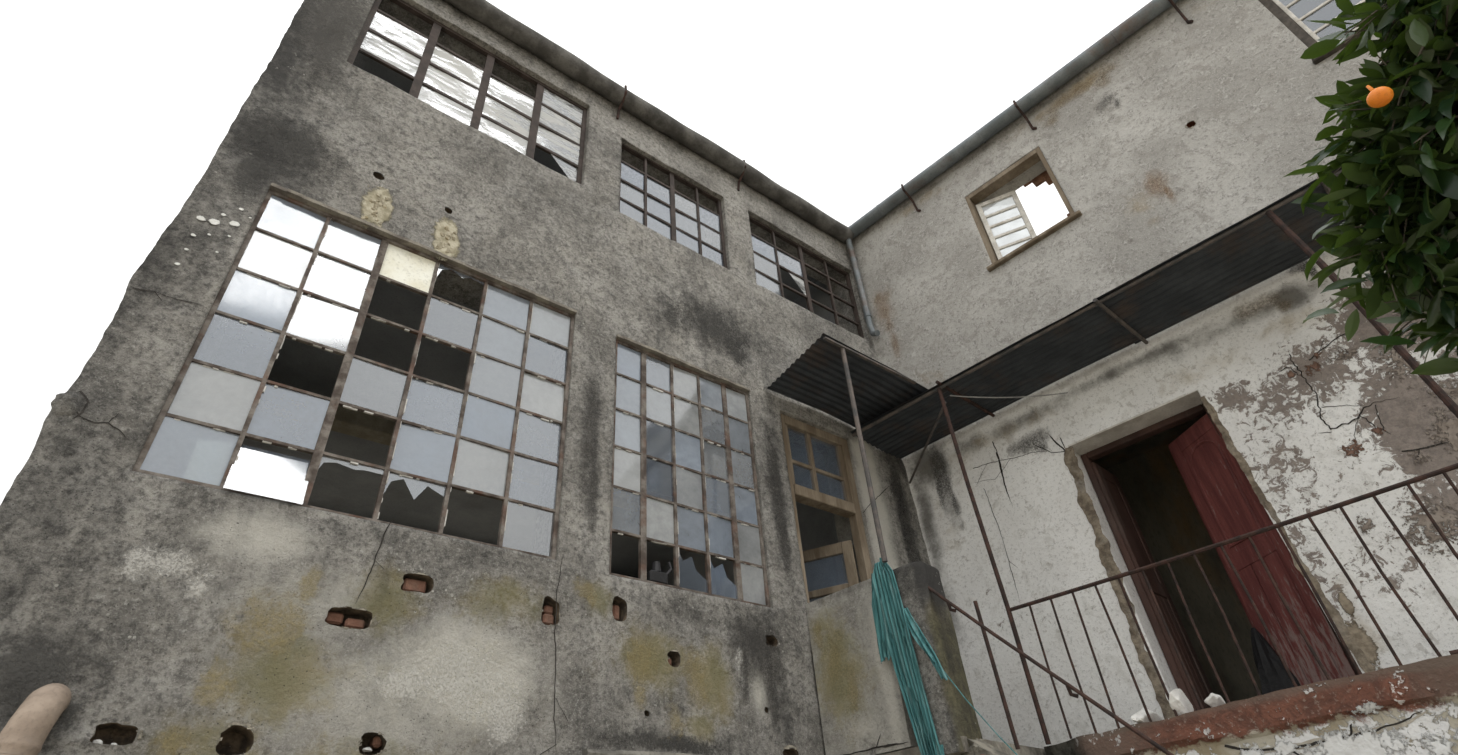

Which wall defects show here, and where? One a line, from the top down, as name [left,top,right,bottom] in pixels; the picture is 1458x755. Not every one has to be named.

spalling [431,207,460,261]
leakage [664,293,749,366]
crack [76,411,130,441]
leakage [582,385,598,528]
leakage [124,549,204,594]
crack [357,520,392,600]
spalling [401,572,434,595]
spalling [1200,396,1386,673]
peeling [1356,495,1458,561]
spalling [325,606,381,630]
leakage [377,650,522,742]
peeling [1240,700,1458,755]